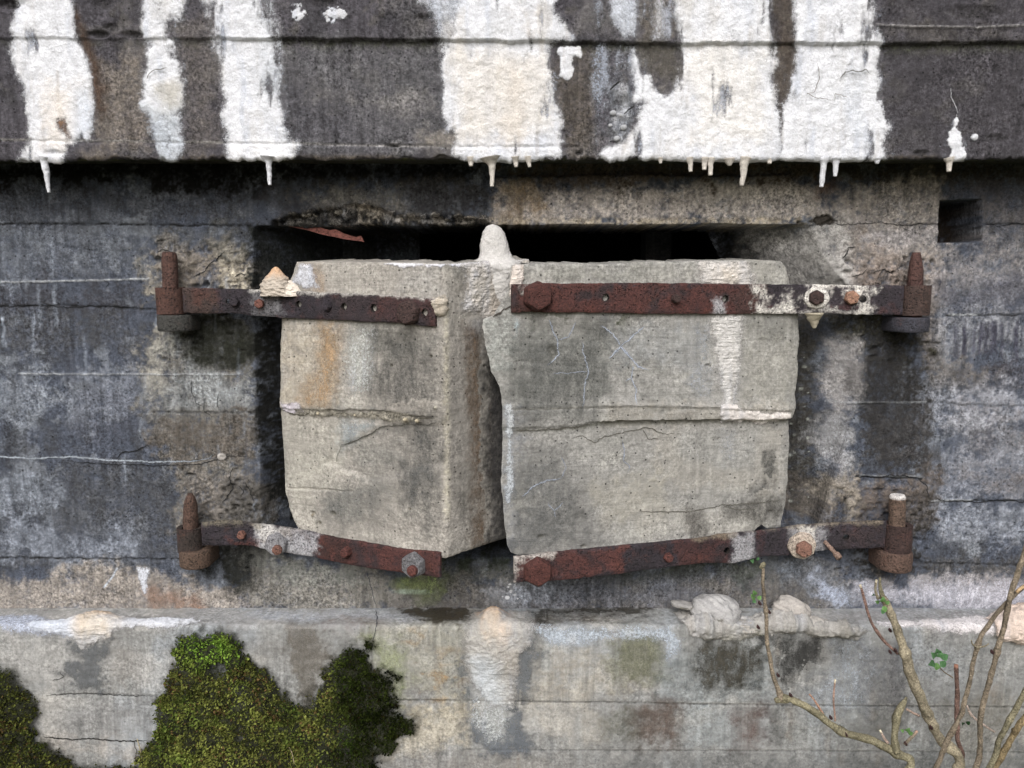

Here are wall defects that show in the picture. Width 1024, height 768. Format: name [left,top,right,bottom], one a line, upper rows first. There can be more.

damp [10,0,102,193]
damp [139,0,186,163]
damp [202,0,300,185]
damp [418,0,574,187]
damp [591,48,607,102]
damp [596,0,893,187]
damp [943,93,978,172]
spalling [277,203,490,228]
crack [281,409,435,461]
crack [515,320,672,517]
damp [205,549,260,592]
damp [453,607,652,758]